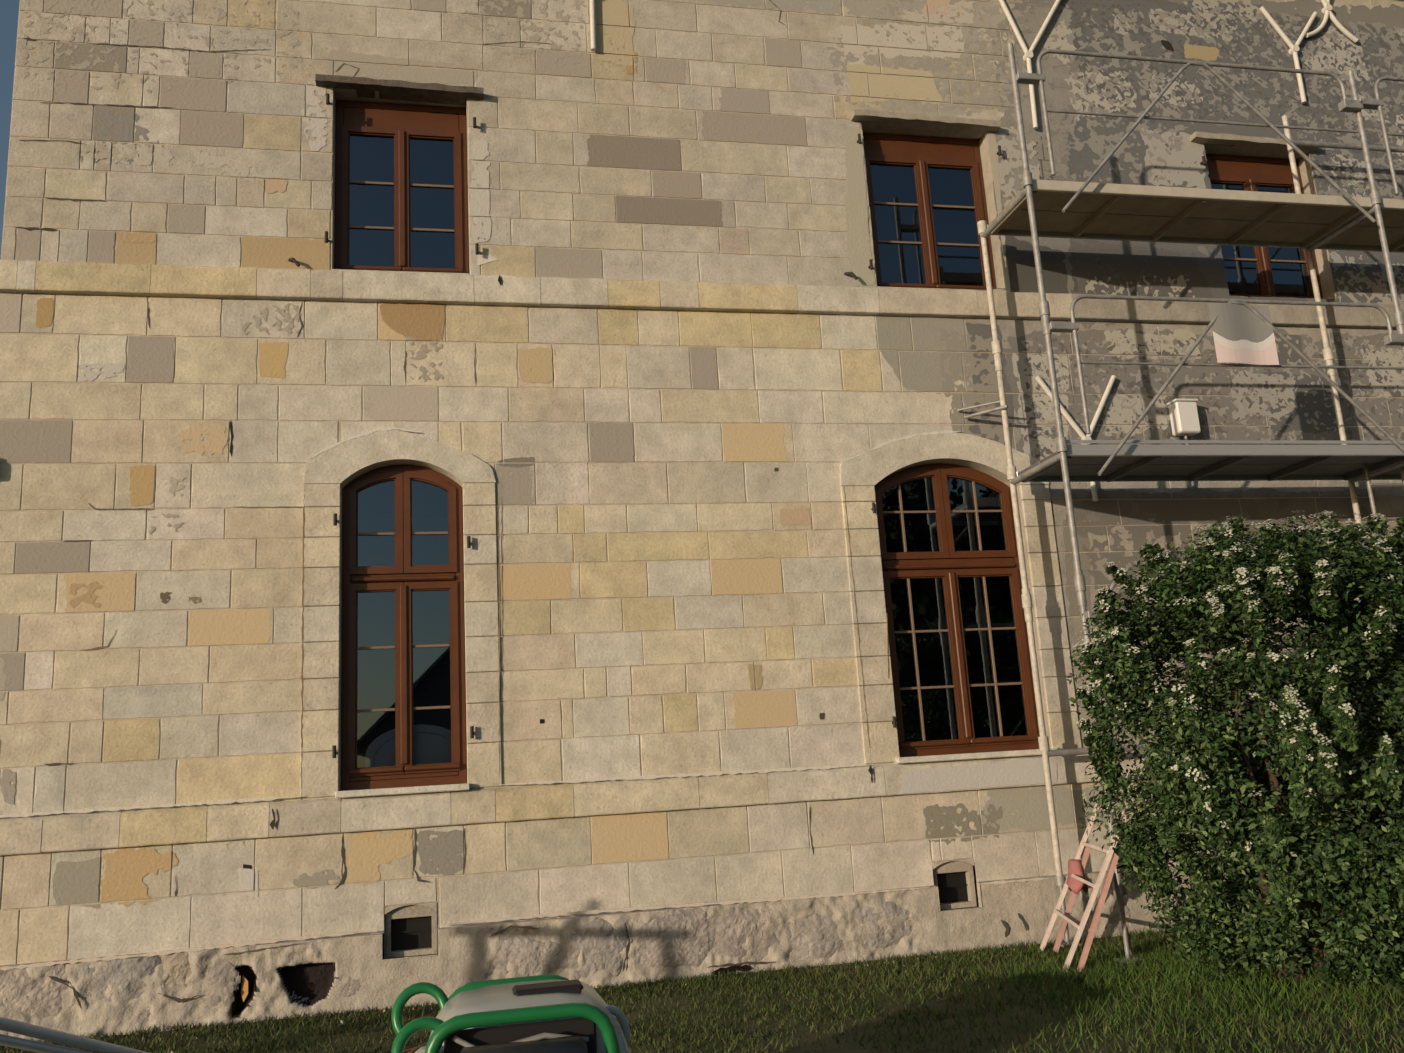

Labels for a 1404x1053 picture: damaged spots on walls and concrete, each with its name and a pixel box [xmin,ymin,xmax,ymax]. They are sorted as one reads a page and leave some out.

peeling [840,0,976,104]
peeling [997,0,1404,207]
peeling [1085,274,1195,298]
peeling [1330,251,1404,304]
spalling [405,337,443,382]
peeling [1012,329,1404,460]
spalling [923,803,1003,845]
crack [335,836,346,889]
crack [413,829,431,883]
crack [460,828,468,874]
hole [231,965,256,1018]
hole [277,962,335,1006]